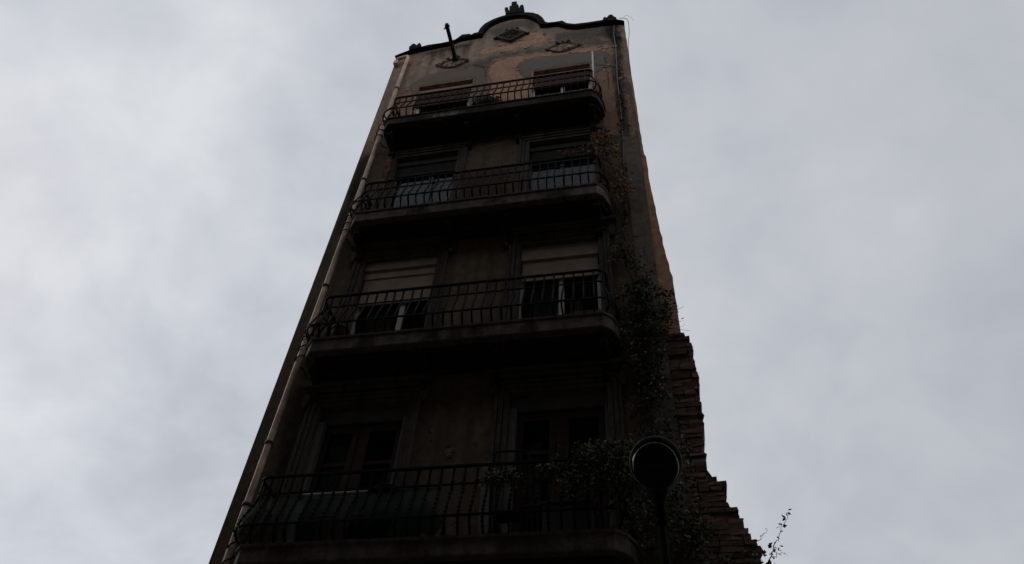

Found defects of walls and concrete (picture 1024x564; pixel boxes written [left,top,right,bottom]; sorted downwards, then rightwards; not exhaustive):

flaking render [474,29,637,142]